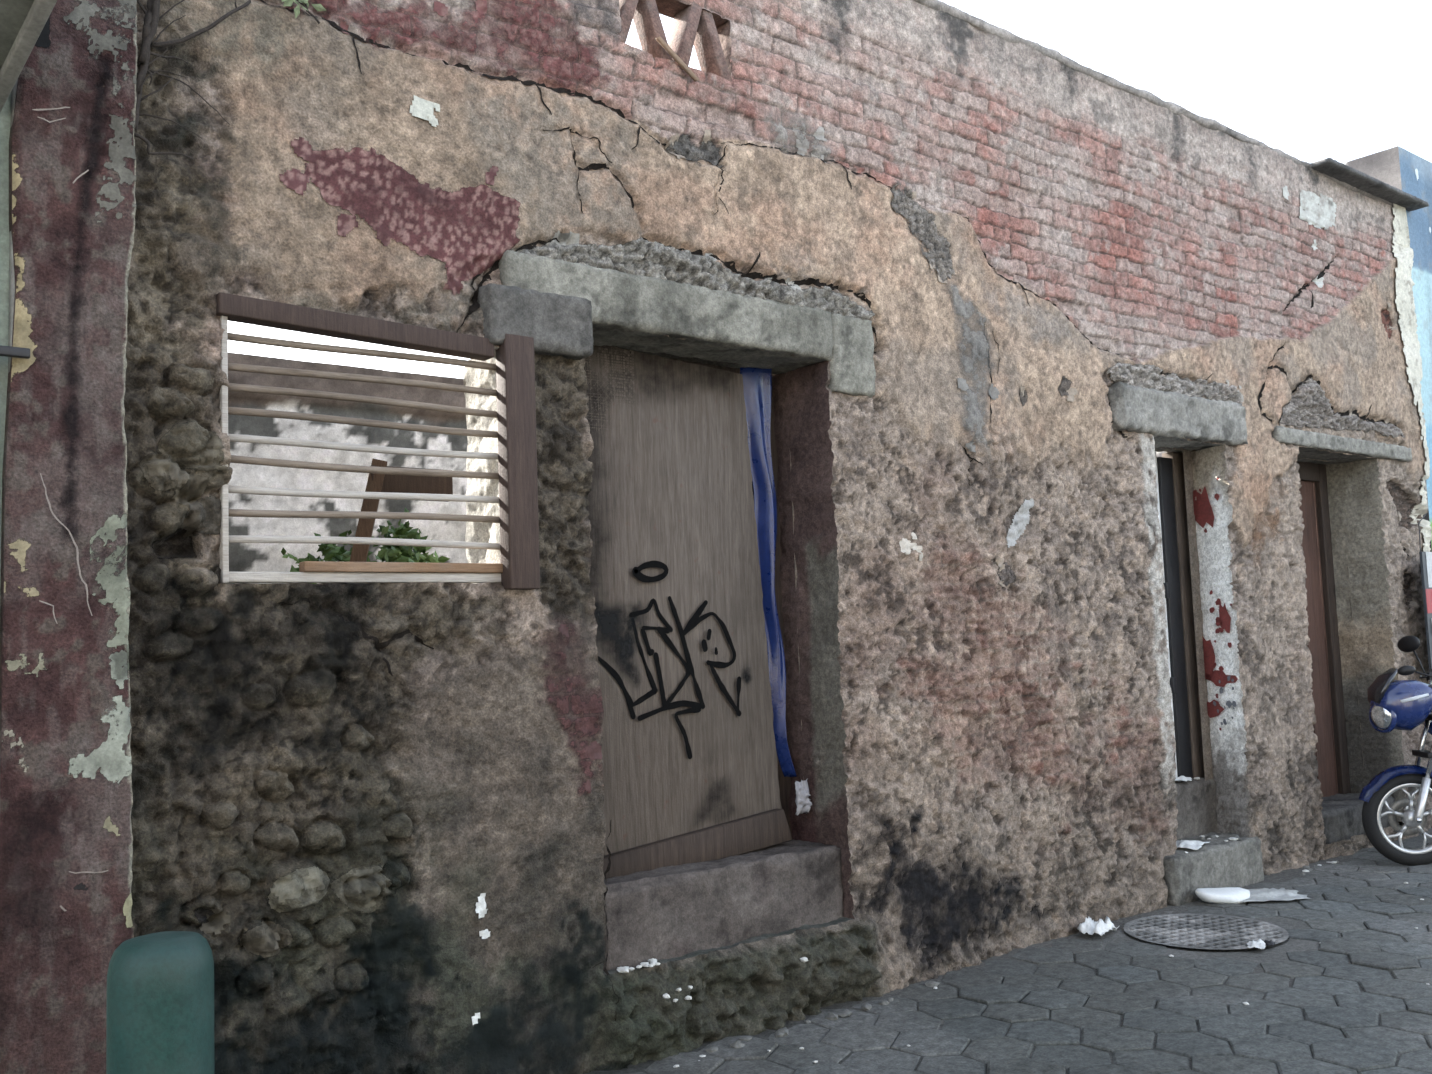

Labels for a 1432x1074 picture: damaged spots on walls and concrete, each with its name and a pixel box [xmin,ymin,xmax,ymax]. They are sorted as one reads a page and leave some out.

peeling [63,0,137,224]
peeling [286,0,608,95]
crack [260,0,893,353]
peeling [279,137,875,320]
spalling [665,130,724,168]
spalling [890,181,955,283]
spalling [1106,363,1244,406]
crack [1257,256,1397,438]
spalling [1381,303,1397,338]
peeling [68,514,132,783]
damp [214,874,594,1074]
damp [862,820,1024,970]